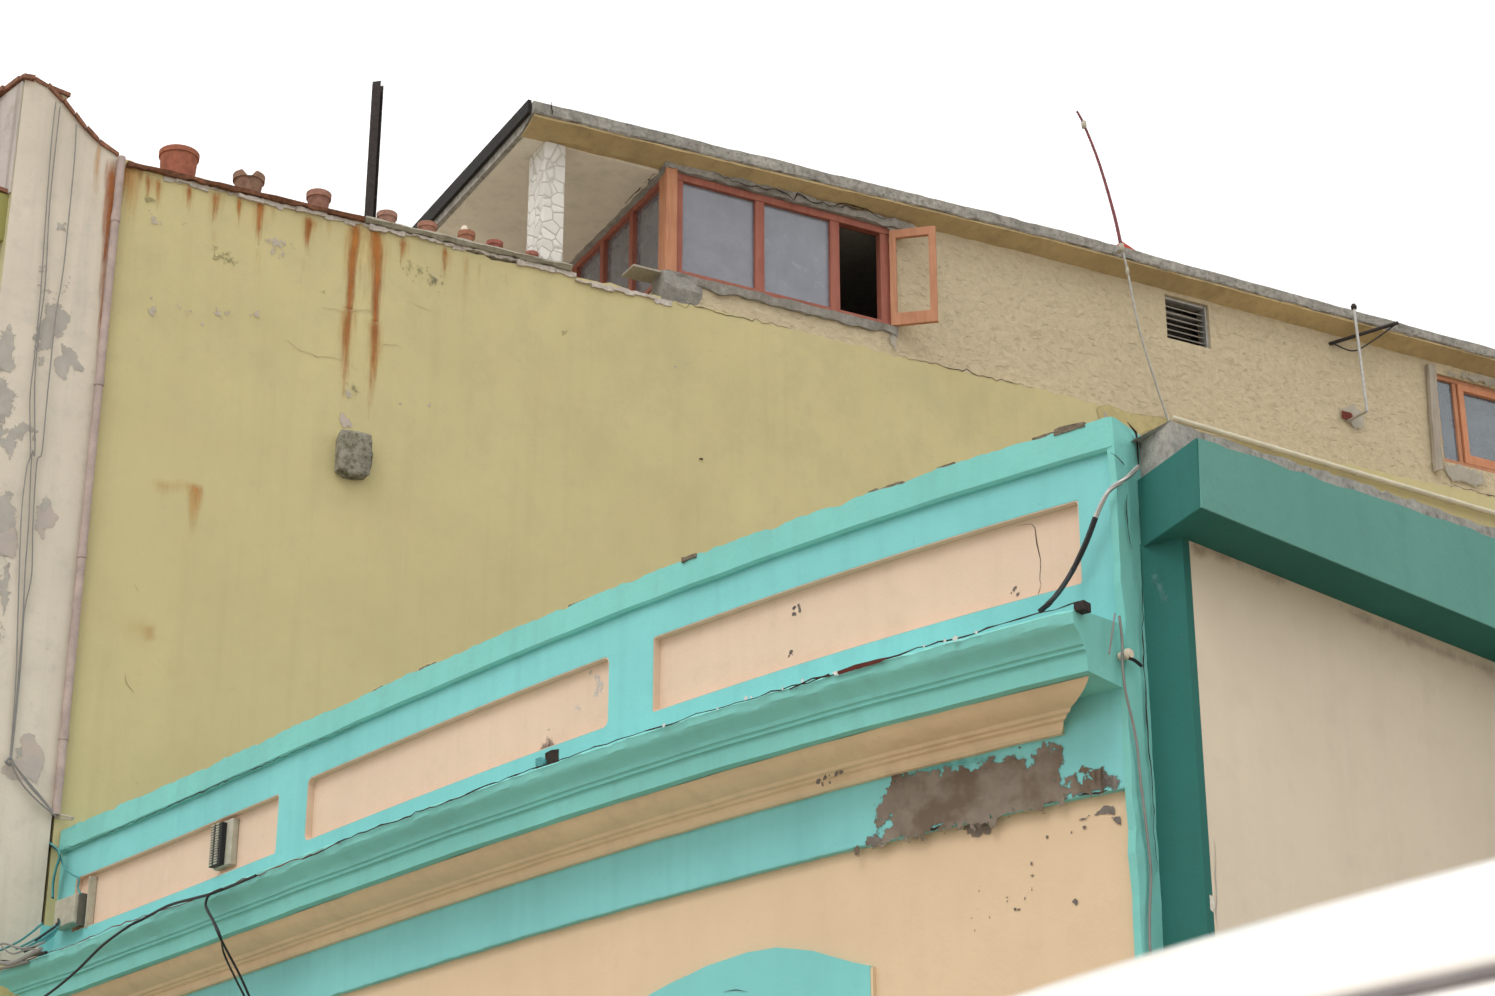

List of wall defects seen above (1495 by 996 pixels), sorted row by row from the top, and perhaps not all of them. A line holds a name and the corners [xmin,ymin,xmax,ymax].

corrosion [103,169,116,260]
peeling [0,265,84,460]
corrosion [345,225,382,366]
peeling [0,491,59,638]
peeling [853,741,1121,857]